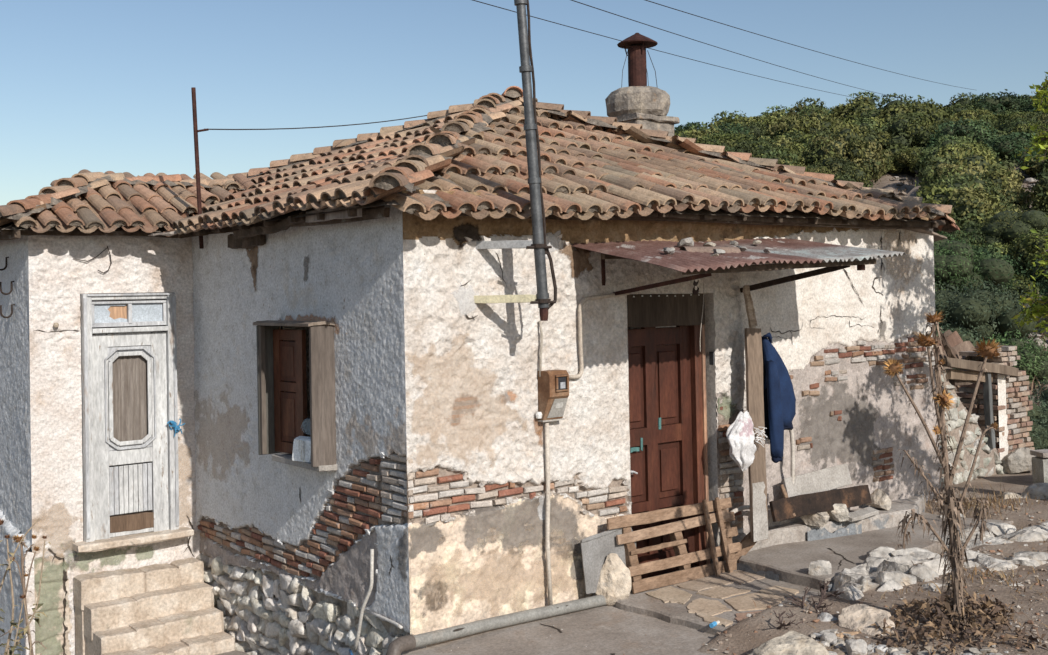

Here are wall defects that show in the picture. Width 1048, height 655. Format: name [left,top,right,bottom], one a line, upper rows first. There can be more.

flaking render [403,212,859,253]
crack [771,231,903,345]
flaking render [716,333,940,542]
crack [48,548,68,655]
flaking render [196,452,630,655]
damp [398,521,444,581]
damp [462,494,586,581]